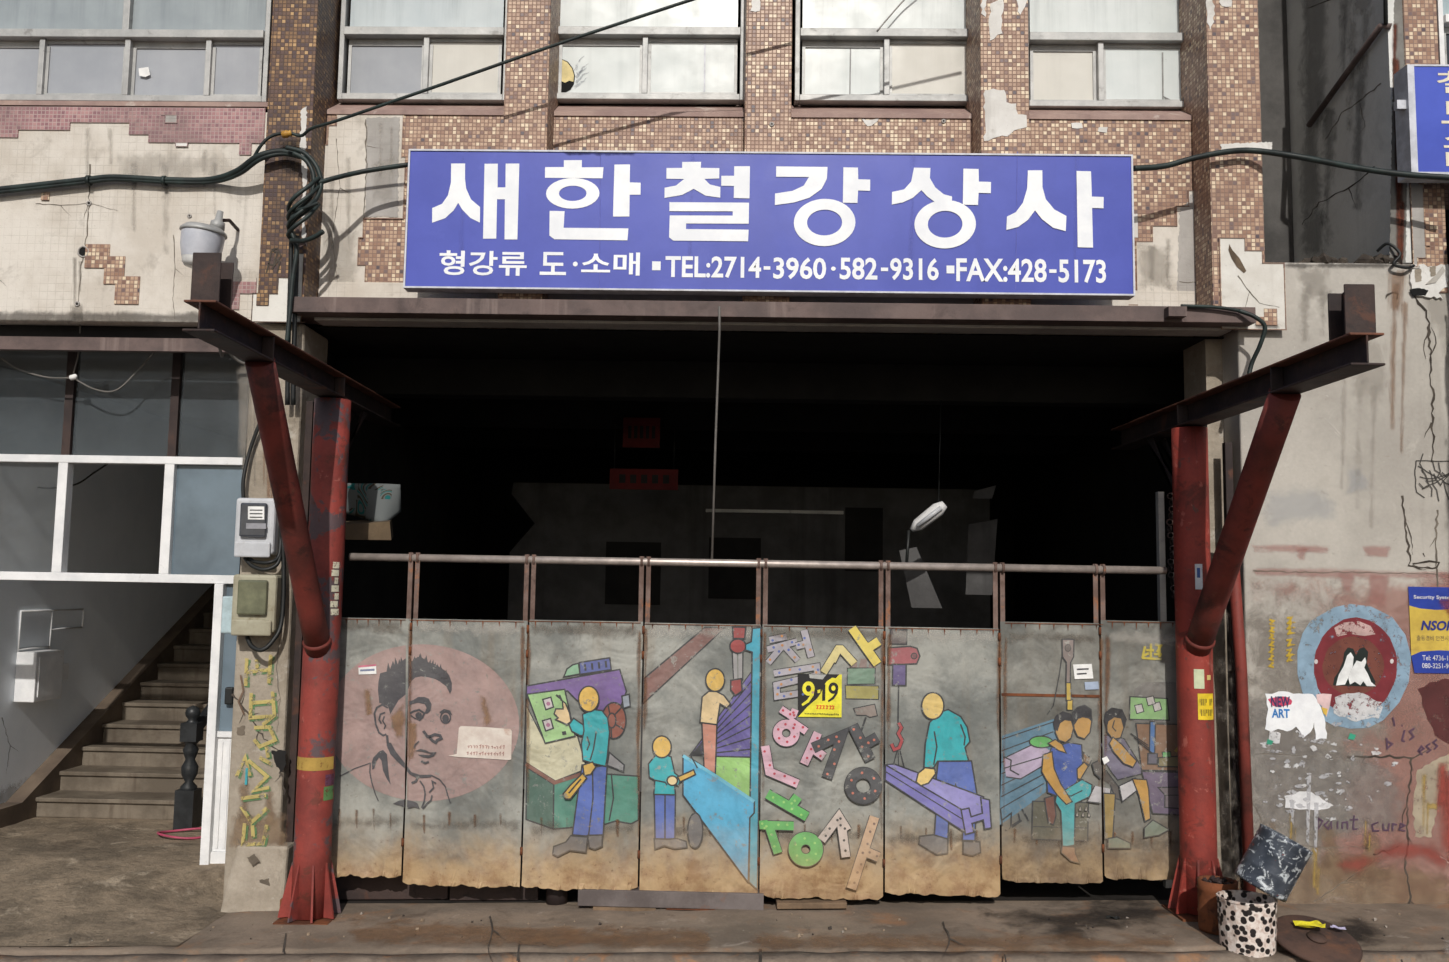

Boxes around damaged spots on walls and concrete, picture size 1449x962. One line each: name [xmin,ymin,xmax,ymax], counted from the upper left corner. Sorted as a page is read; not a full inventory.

spalling [980,0,1027,41]
spalling [983,89,1027,141]
crack [1325,83,1381,139]
crack [1302,166,1374,225]
crack [1386,291,1437,461]